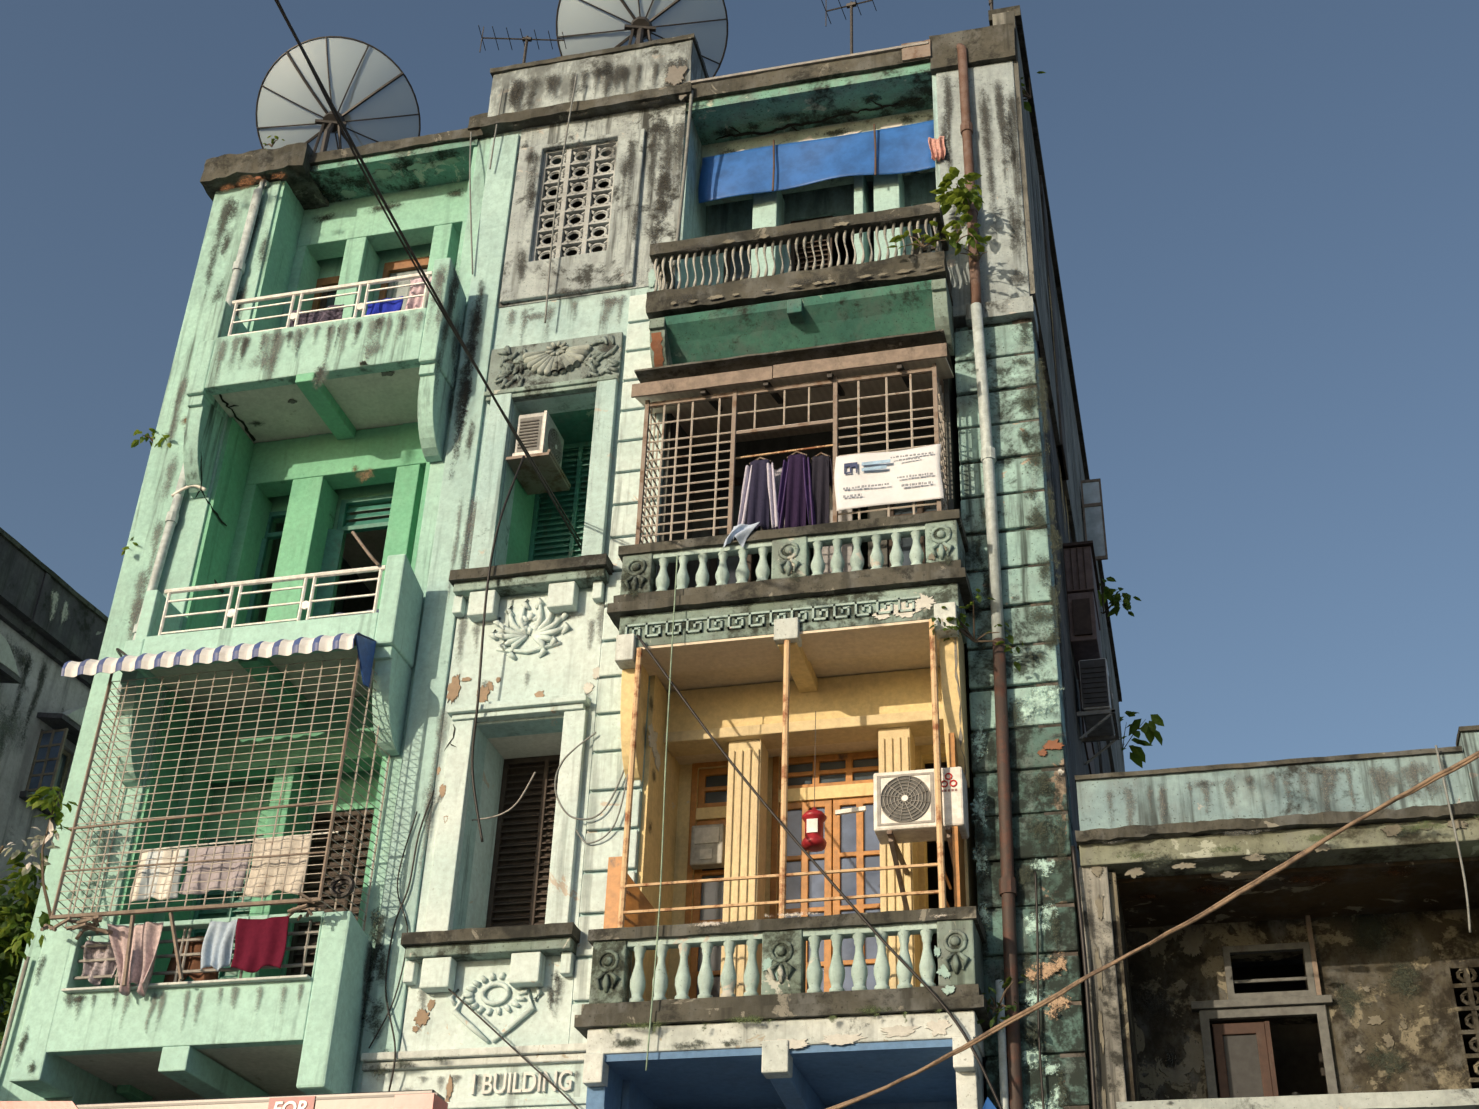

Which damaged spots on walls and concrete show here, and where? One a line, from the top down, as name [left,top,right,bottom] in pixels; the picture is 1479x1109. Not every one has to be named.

leakage [508,58,687,126]
leakage [941,78,952,168]
leakage [517,141,539,206]
leakage [606,123,687,235]
leakage [207,200,245,316]
leakage [246,206,269,259]
leakage [218,261,484,453]
crack [219,394,256,442]
leakage [0,638,47,749]
peeling [447,674,501,704]
peeling [1147,925,1205,957]
peeling [1159,1035,1204,1087]